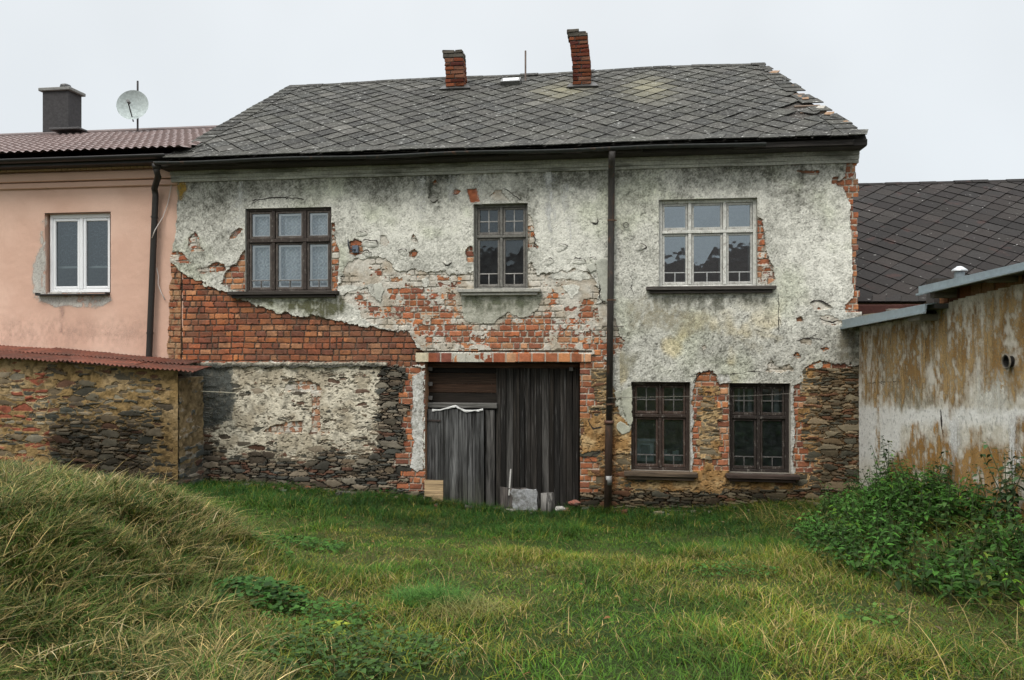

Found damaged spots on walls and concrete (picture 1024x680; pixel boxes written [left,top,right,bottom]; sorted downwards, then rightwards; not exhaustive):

flaking render [453,188,509,202]
flaking render [32,231,111,307]
flaking render [811,163,860,325]
flaking render [165,214,859,512]
leakage [1008,415,1021,471]